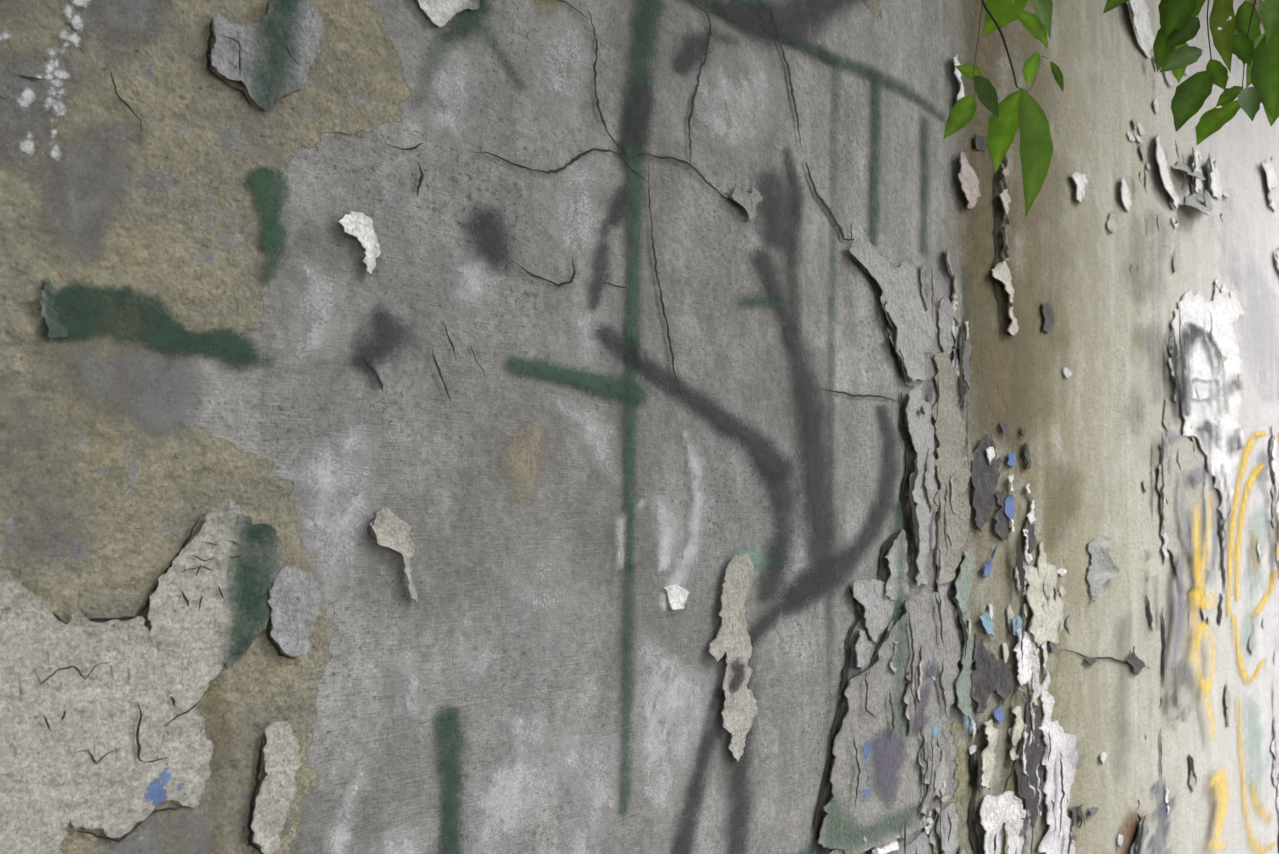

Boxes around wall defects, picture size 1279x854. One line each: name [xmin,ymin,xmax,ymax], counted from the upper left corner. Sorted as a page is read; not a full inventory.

peeling [417,0,480,27]
crack [384,141,424,196]
crack [475,0,741,404]
crack [770,3,854,241]
peeling [1261,156,1278,211]
spalling [0,0,418,854]
peeling [814,240,1099,854]
peeling [1086,537,1120,602]
peeling [1142,275,1246,632]
peeling [1271,435,1279,565]
peeling [1125,646,1145,675]
peeling [1115,799,1149,854]